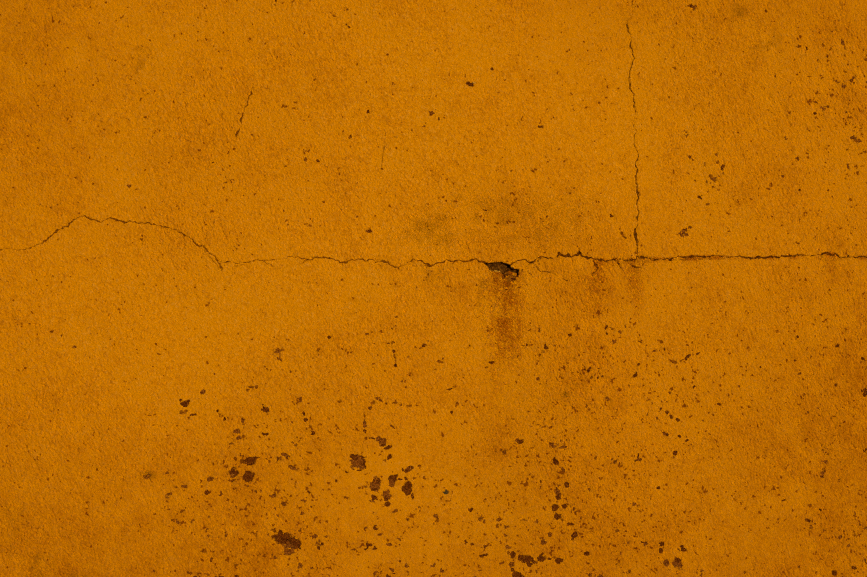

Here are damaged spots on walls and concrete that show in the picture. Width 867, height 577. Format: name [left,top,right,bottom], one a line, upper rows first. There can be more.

crack [508,135,867,281]
crack [25,215,486,268]
hole [486,262,519,281]
peeling [363,397,412,461]
peeling [228,447,312,517]
peeling [345,454,366,473]
peeling [358,465,426,528]
peeling [267,528,328,559]